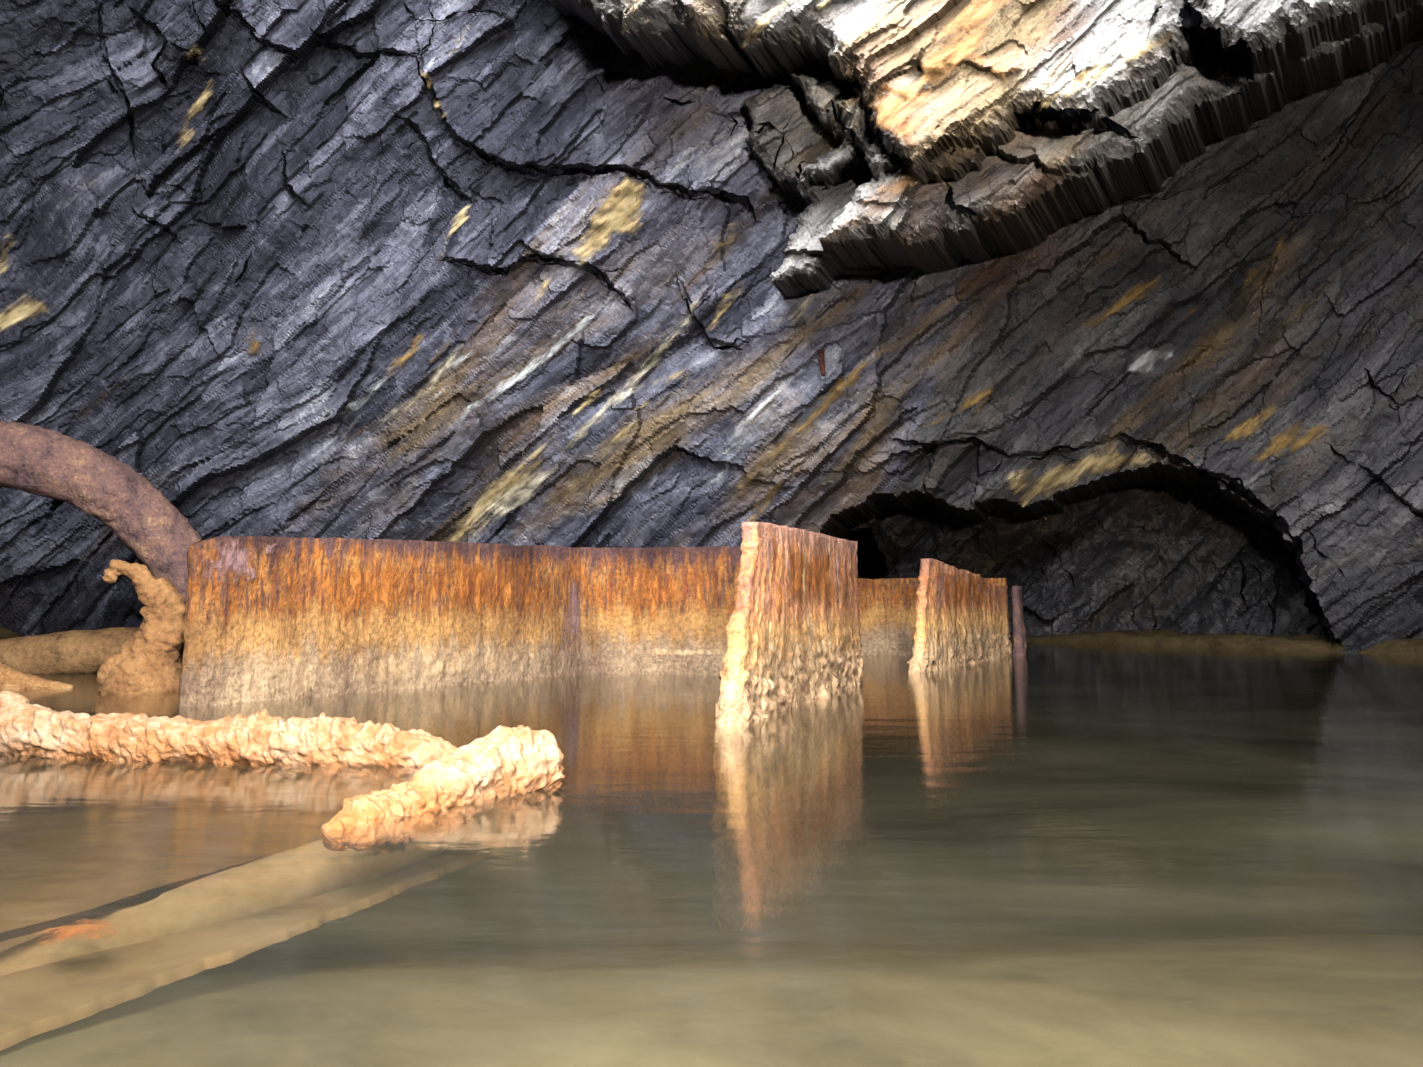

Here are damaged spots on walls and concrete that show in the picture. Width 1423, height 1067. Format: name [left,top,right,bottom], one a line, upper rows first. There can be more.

crack [98,0,756,251]
crack [663,79,998,216]
crack [438,253,635,311]
corrosion [271,560,580,662]
corrosion [609,568,717,620]
corrosion [767,531,851,608]
corrosion [939,572,998,614]
crack [888,433,1345,644]